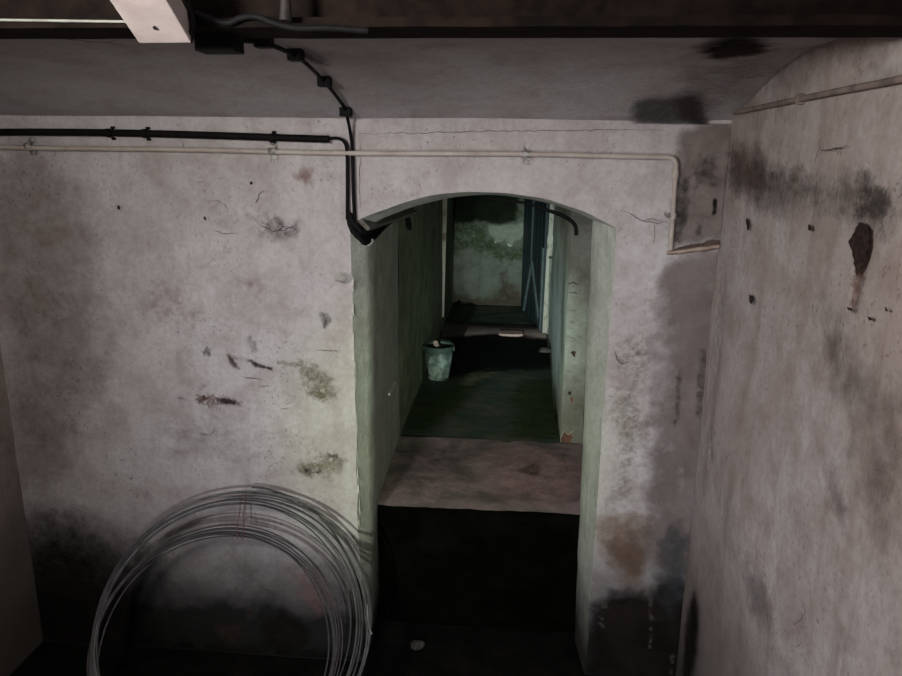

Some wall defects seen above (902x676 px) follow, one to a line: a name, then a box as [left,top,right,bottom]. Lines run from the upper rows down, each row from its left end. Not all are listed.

spalling [847,222,869,311]
leakage [306,368,332,398]
leakage [590,256,724,676]